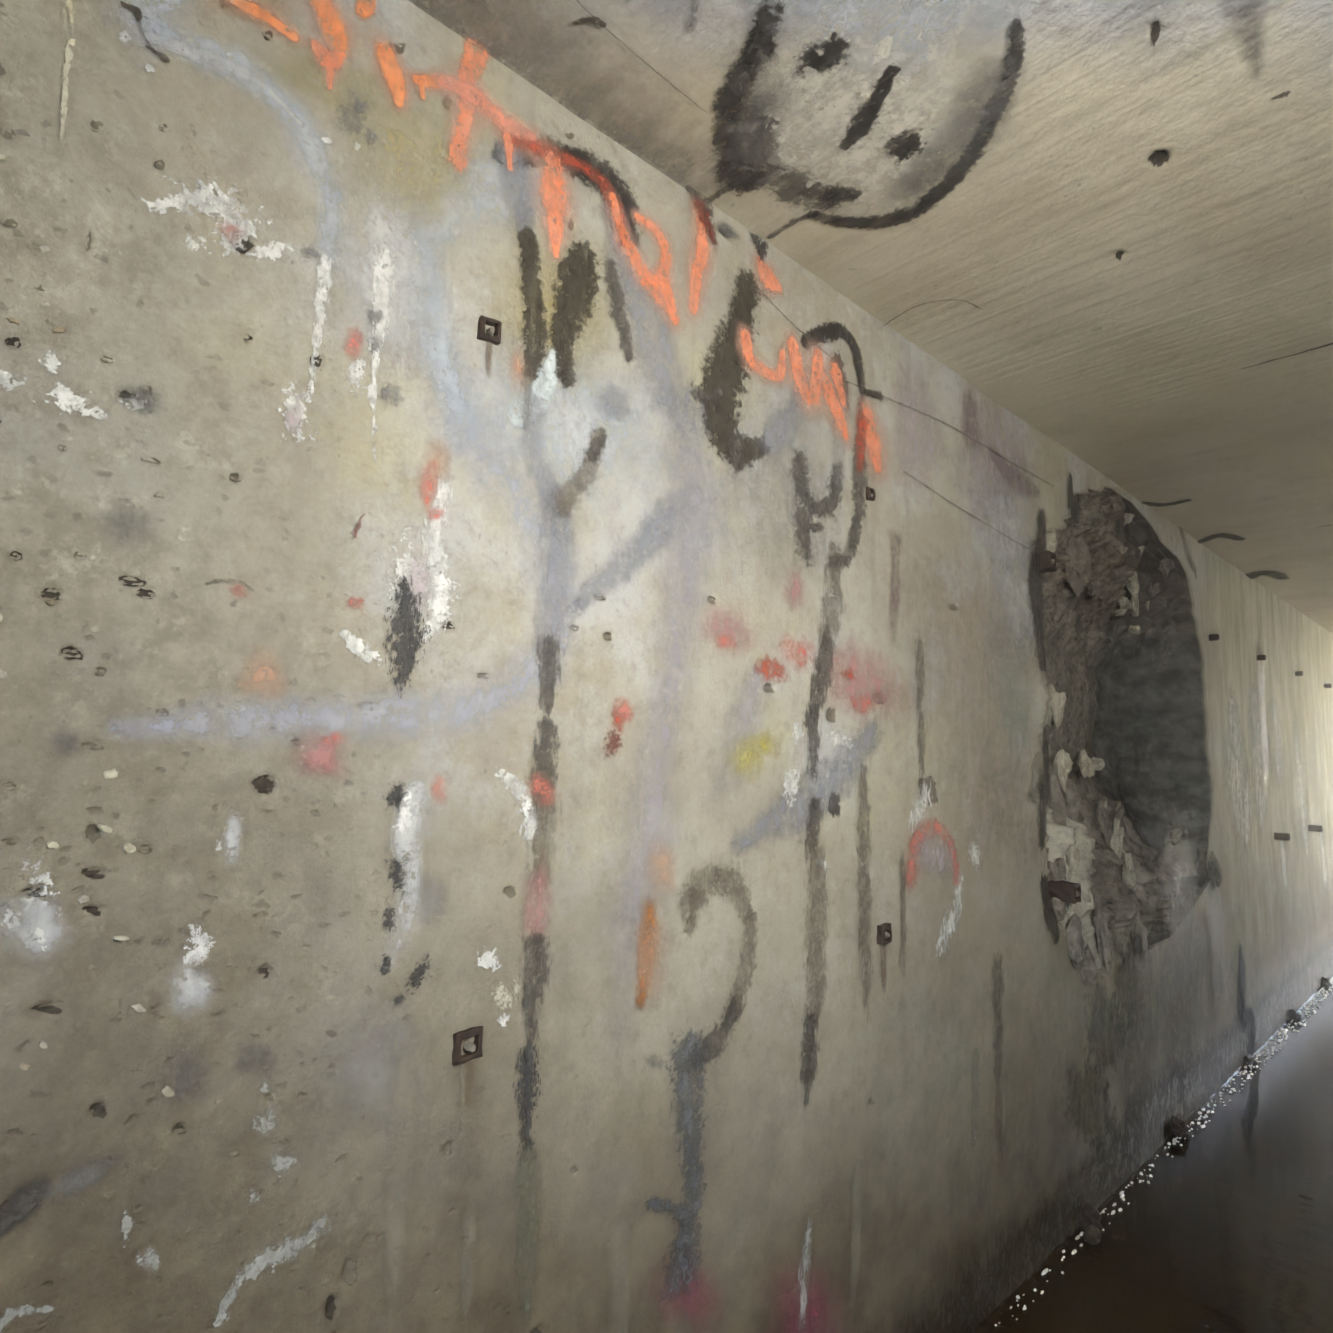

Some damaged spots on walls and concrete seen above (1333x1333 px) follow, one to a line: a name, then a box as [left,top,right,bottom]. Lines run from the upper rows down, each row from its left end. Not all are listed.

crack [1272,91,1290,99]
crack [1242,343,1333,369]
crack [1141,498,1246,572]
crack [1246,570,1291,580]
spalling [1020,484,1223,986]